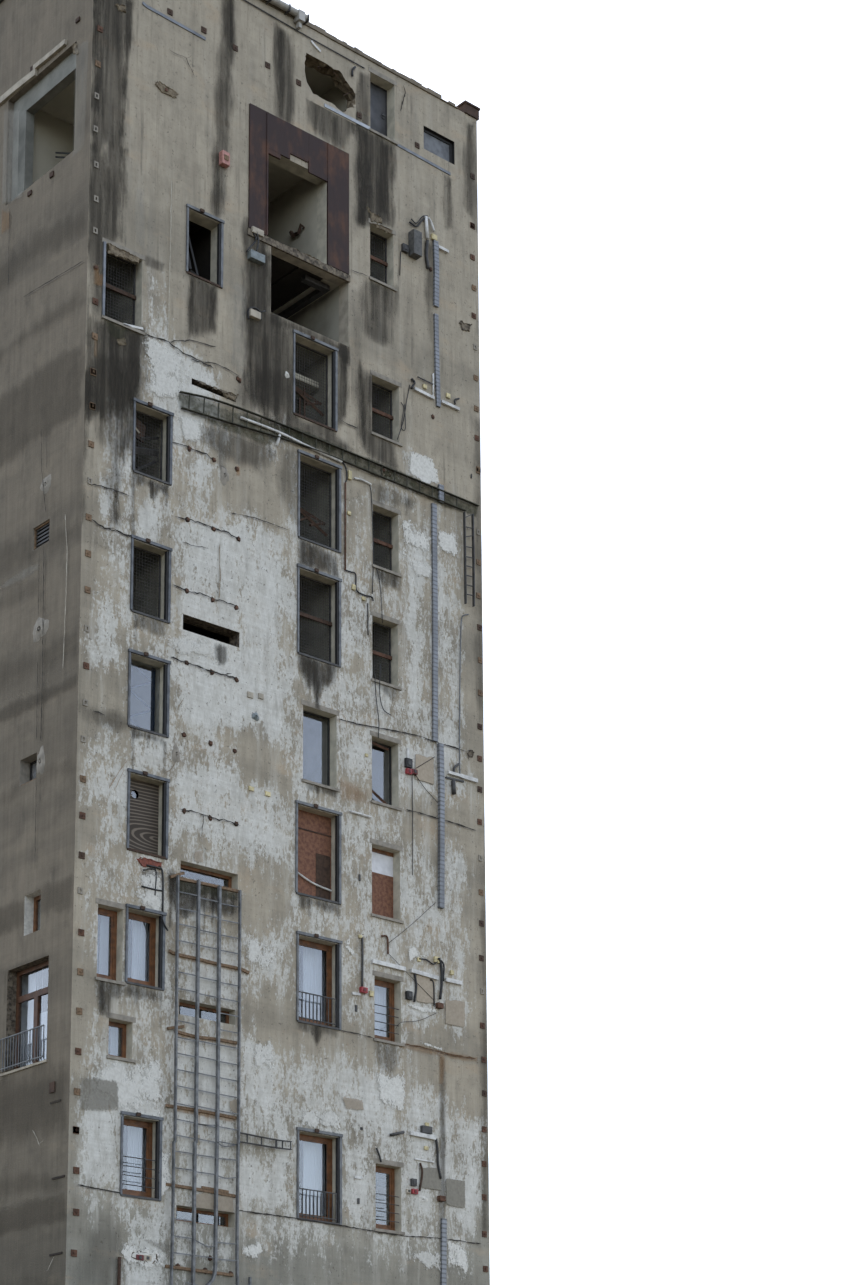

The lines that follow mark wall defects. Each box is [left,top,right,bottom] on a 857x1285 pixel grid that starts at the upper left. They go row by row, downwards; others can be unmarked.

damp [221,0,233,65]
spalling [303,51,356,125]
damp [88,0,131,293]
damp [214,82,227,217]
damp [319,74,394,226]
peeling [144,337,239,401]
peeling [409,452,440,484]
peeling [402,520,458,577]
damp [300,655,335,705]
peeling [136,857,166,911]
peeling [81,1058,163,1117]
peeling [162,1152,172,1196]